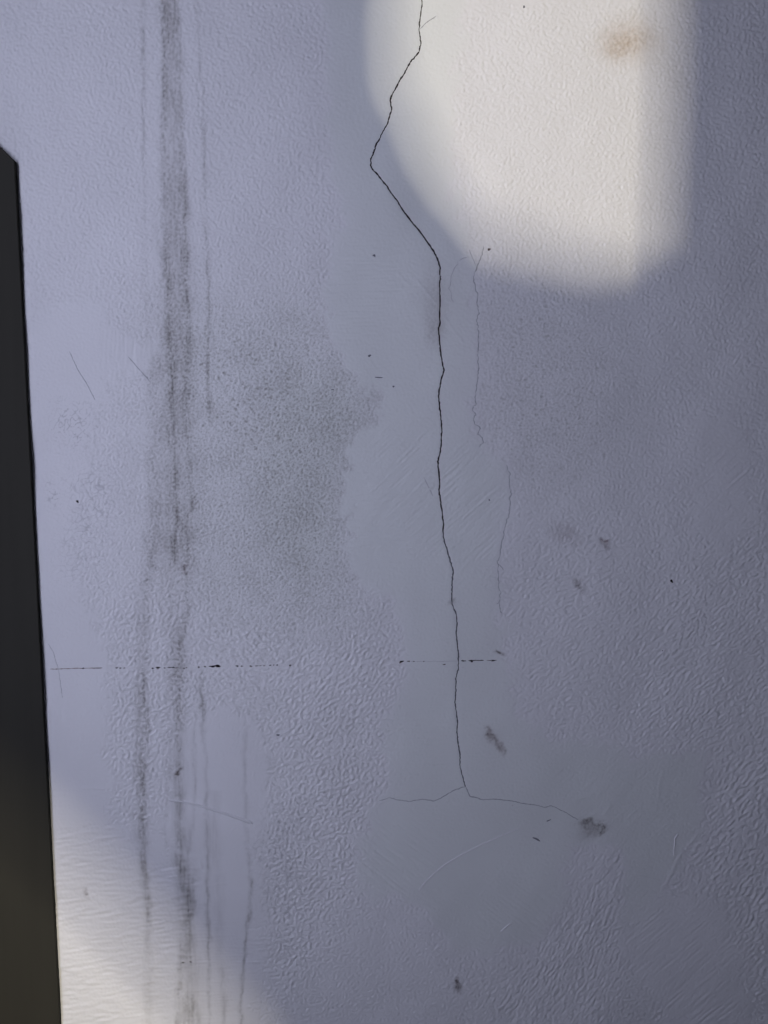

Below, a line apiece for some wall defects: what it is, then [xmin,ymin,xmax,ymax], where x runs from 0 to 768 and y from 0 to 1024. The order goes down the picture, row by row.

crack [370,0,578,820]